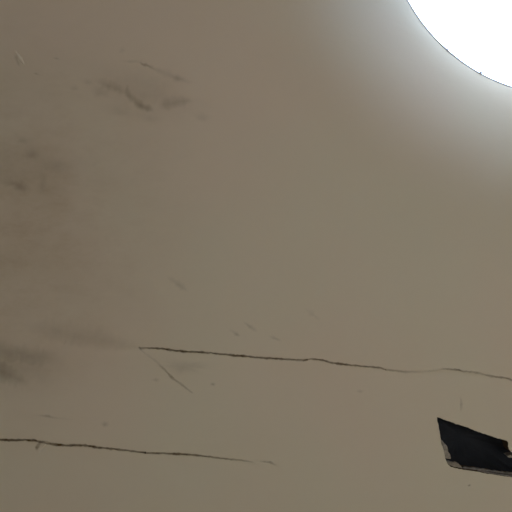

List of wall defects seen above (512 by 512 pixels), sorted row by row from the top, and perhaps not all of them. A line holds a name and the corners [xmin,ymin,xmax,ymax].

crack [152,348,294,360]
crack [0,439,206,457]
spalling [437,417,512,477]